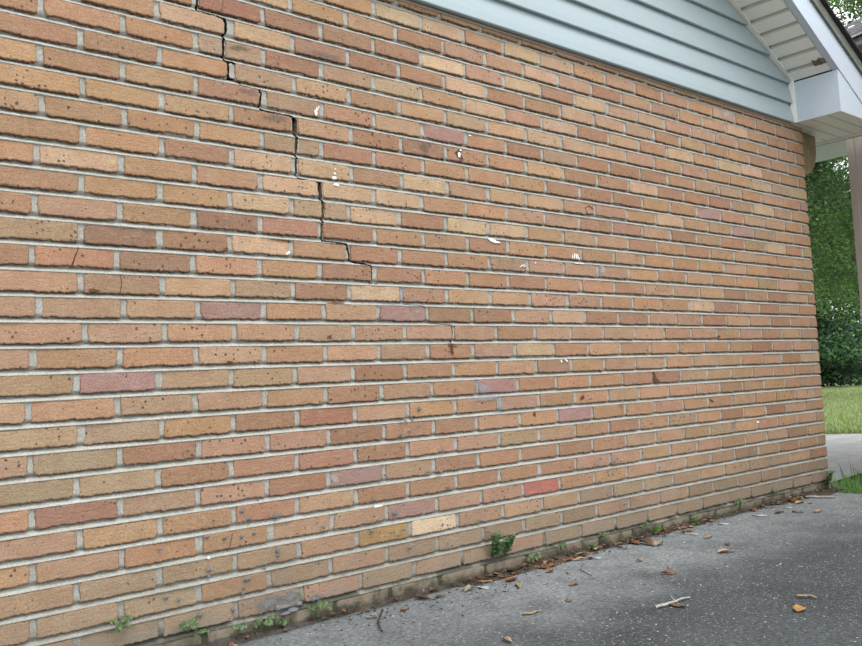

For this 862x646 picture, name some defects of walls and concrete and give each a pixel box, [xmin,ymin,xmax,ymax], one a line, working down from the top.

crack [194,4,377,285]